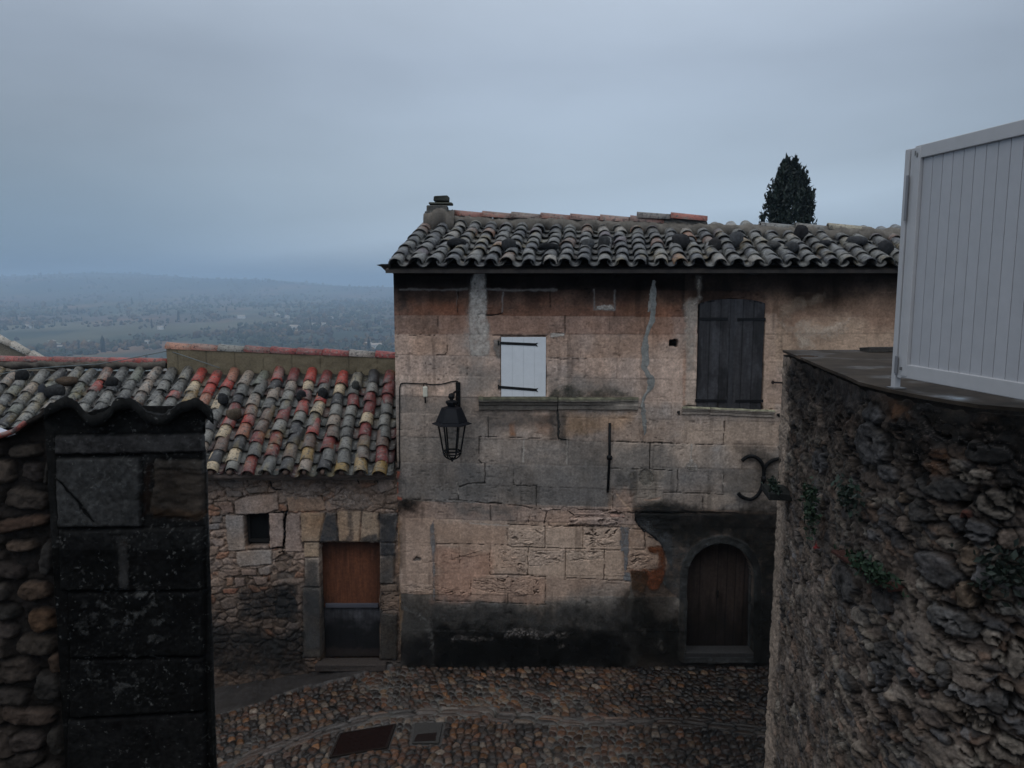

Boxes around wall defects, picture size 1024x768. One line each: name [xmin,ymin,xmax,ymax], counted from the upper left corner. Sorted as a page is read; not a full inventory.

crack [640,280,657,435]
spalling [541,507,666,593]
damp [399,593,687,669]